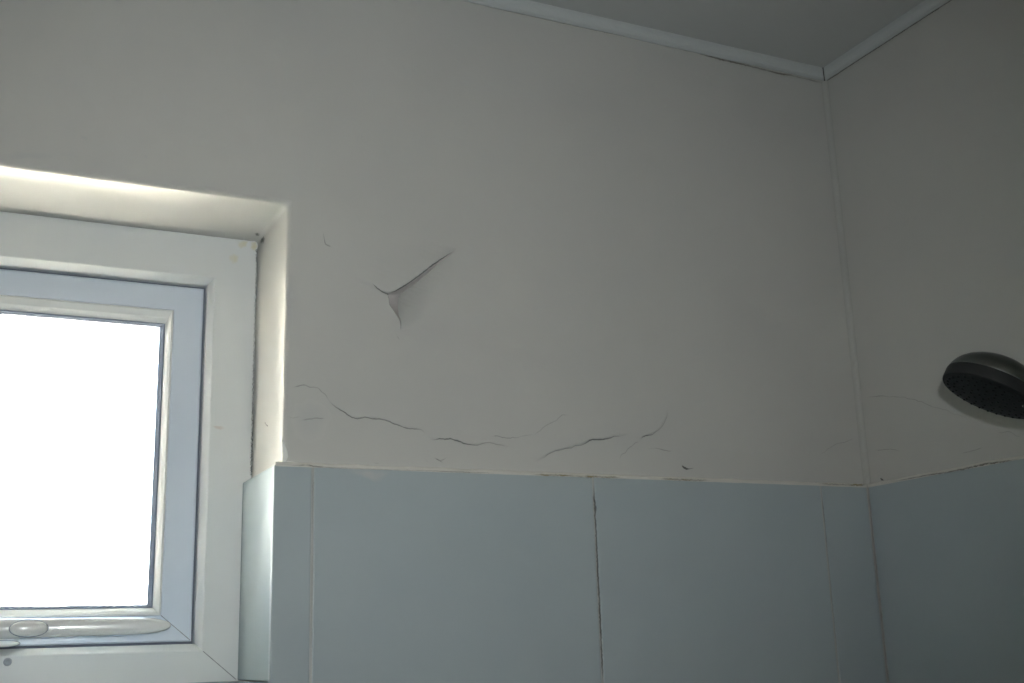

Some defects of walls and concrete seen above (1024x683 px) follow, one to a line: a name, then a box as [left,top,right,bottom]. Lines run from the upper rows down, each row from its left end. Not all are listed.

peeling [337,240,460,330]